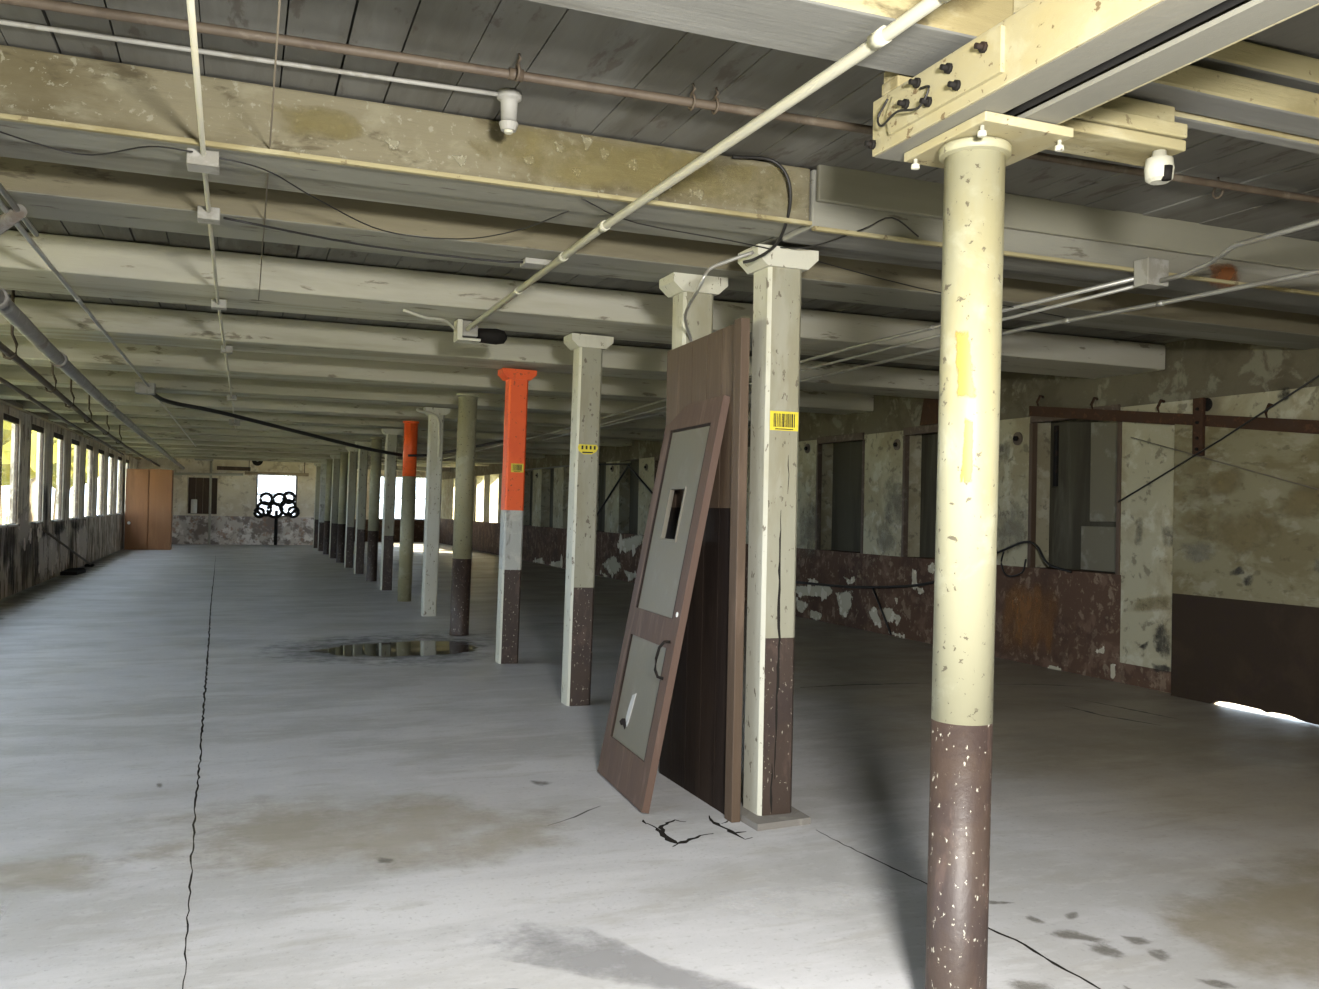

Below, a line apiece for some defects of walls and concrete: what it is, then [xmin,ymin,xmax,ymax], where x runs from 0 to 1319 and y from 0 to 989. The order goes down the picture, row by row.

water stain [1,488,79,593]
peeling [533,554,563,568]
peeling [600,533,643,582]
peeling [796,577,855,620]
peeling [869,598,905,638]
peeling [912,562,935,594]
crack [642,455,789,847]
crack [182,556,216,989]
water stain [536,942,733,989]